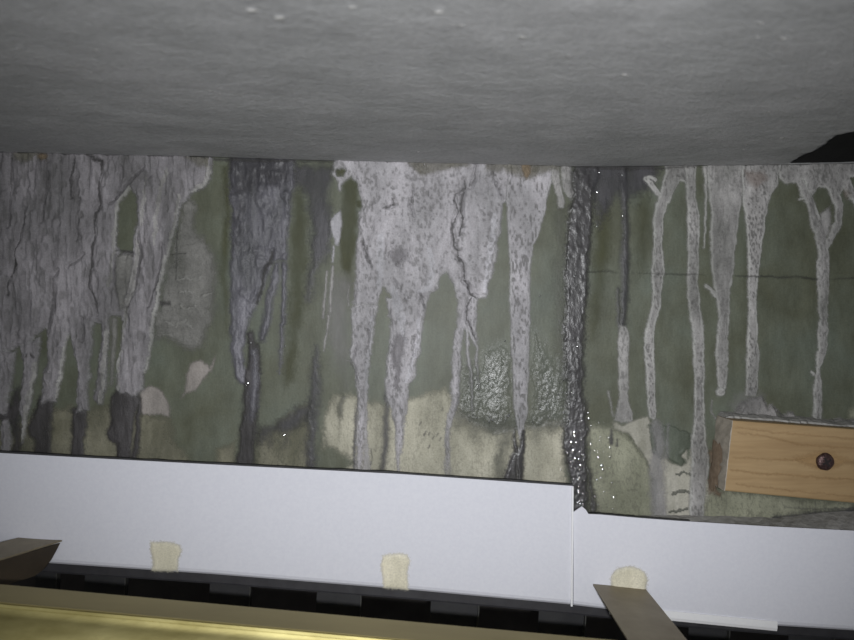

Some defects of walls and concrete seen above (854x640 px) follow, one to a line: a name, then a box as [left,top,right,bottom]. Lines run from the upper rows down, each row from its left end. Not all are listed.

crack [48,281,56,326]
crack [70,155,103,310]
water stain [0,152,213,458]
crack [451,183,475,334]
water stain [229,158,854,516]